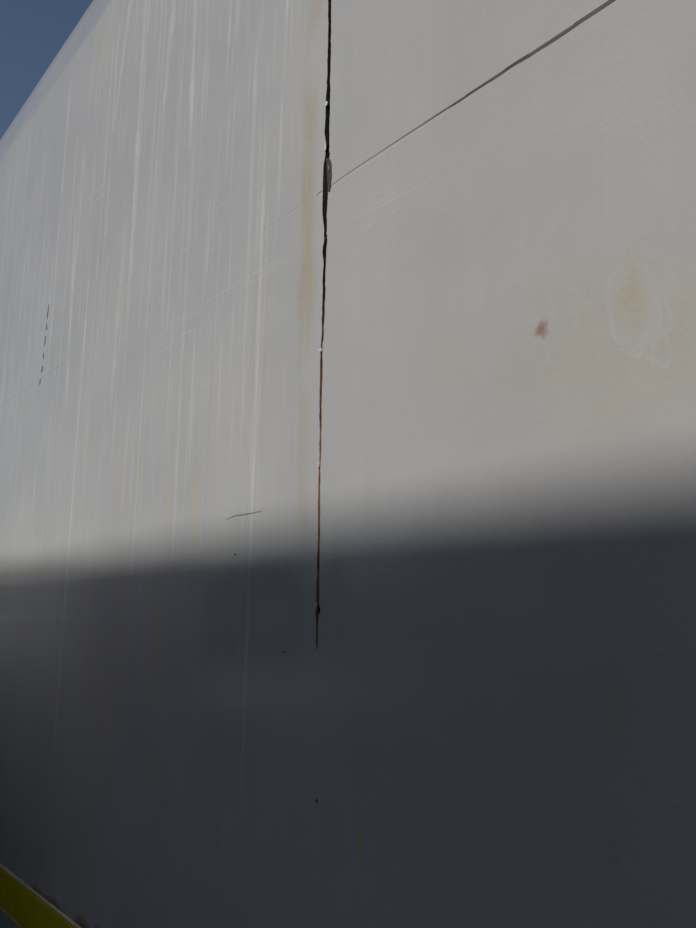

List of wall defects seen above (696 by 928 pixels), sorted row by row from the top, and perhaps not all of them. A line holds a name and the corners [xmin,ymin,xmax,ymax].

crack [315,0,332,647]